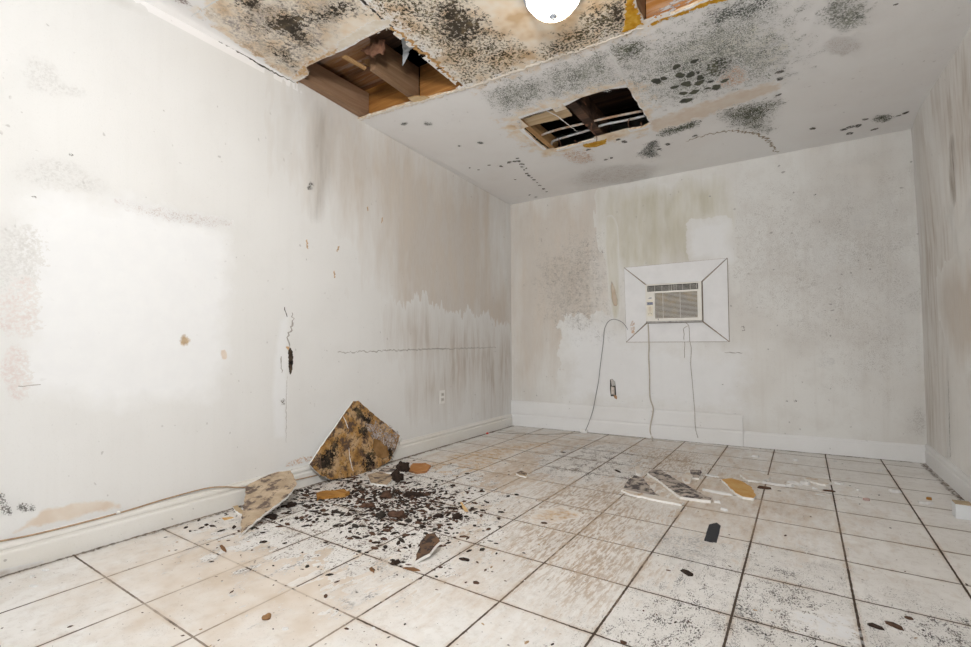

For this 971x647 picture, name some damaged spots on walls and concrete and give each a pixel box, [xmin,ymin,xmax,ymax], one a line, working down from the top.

peeling [621,0,727,33]
peeling [583,138,607,148]
water stain [174,0,971,458]
crack [280,307,295,427]
water stain [0,406,948,647]